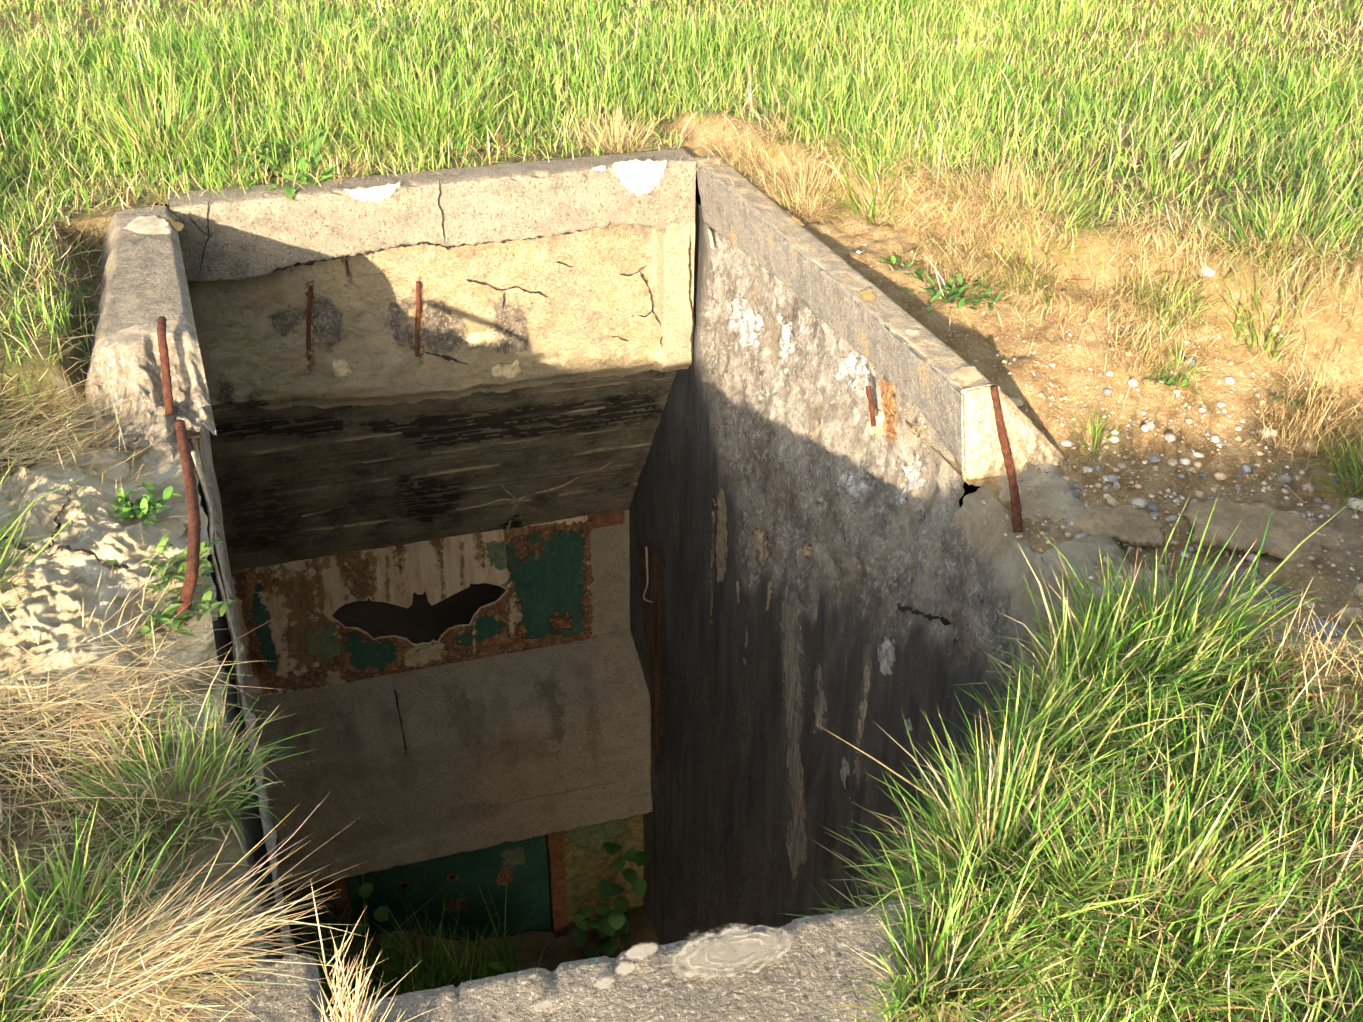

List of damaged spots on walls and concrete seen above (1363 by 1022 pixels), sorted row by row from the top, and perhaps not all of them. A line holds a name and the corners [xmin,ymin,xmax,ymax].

spalling [593,159,667,197]
crack [273,180,591,272]
water stain [269,296,343,346]
spalling [188,224,663,413]
water stain [388,299,469,353]
crack [465,279,549,310]
water stain [490,299,530,354]
rust [879,380,897,441]
spalling [936,366,1173,701]
rust [231,520,594,696]
spalling [0,316,338,966]
spalling [1244,626,1363,670]